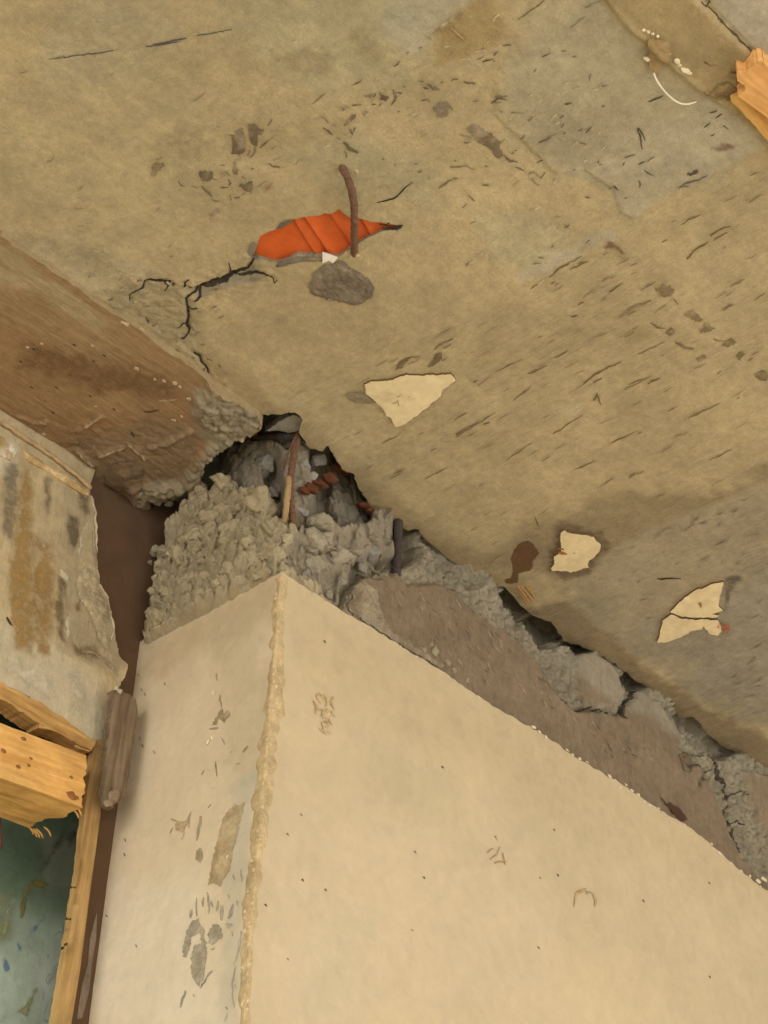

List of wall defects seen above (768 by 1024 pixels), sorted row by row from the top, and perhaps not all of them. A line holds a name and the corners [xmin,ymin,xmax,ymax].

spalling [275,89,402,305]
crack [129,258,278,373]
peeling [346,338,456,444]
spalling [583,362,622,405]
damp [3,464,95,659]
peeling [551,529,601,573]
peeling [657,580,723,643]
spalling [142,412,500,1024]
crack [684,752,749,853]